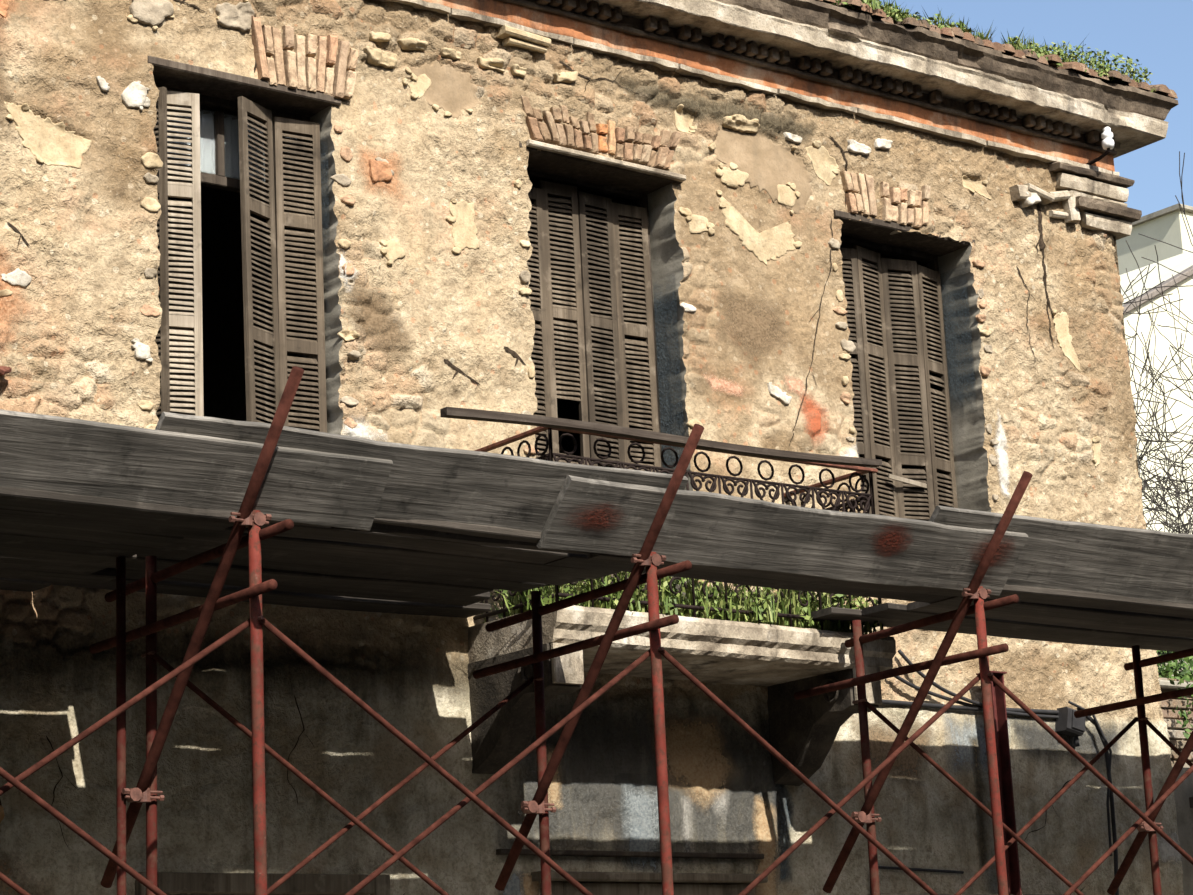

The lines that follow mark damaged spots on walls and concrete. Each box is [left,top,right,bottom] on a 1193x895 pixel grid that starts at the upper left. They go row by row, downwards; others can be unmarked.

peeling [3,101,92,169]
spalling [140,152,163,184]
spalling [320,124,399,249]
spalling [363,37,527,119]
peeling [674,104,697,134]
spalling [678,119,840,266]
peeling [847,138,893,155]
peeling [653,280,703,474]
peeling [942,282,993,406]
peeling [1052,310,1081,372]
crack [46,735,77,847]
damp [508,696,792,881]